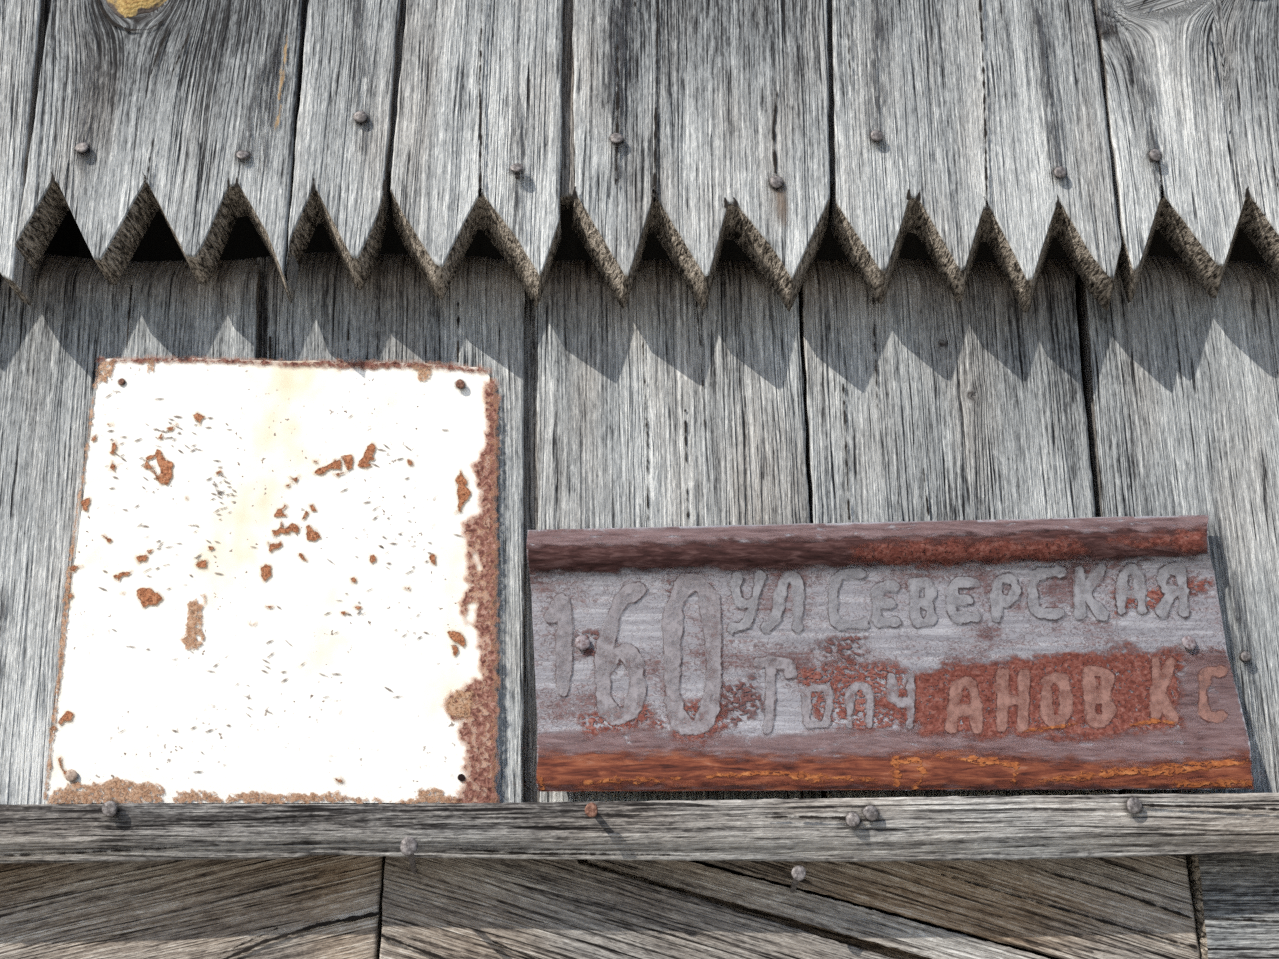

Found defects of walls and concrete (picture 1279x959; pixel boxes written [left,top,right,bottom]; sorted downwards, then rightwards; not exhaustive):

rust [43,357,501,804]
rust [527,516,1208,608]
rust [1112,579,1212,615]
rust [536,615,1253,792]